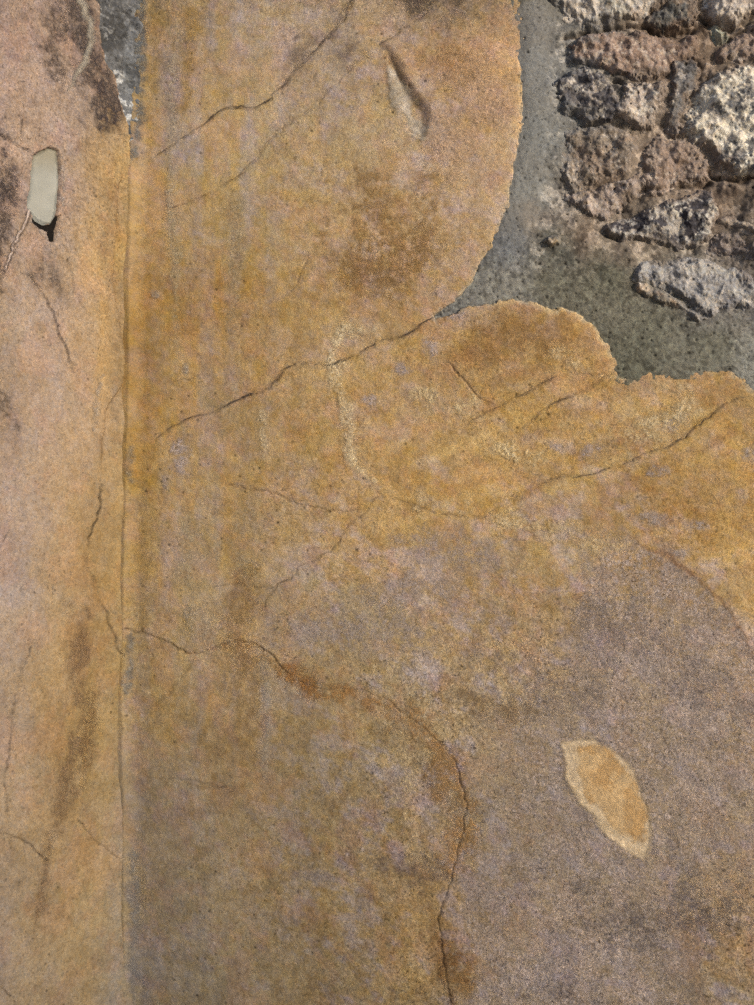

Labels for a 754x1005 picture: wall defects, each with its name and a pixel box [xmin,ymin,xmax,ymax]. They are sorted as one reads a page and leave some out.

crack [158,30,333,154]
spalling [32,217,57,242]
spalling [435,0,754,390]
crack [227,365,292,406]
crack [320,317,433,366]
peeling [562,740,651,858]